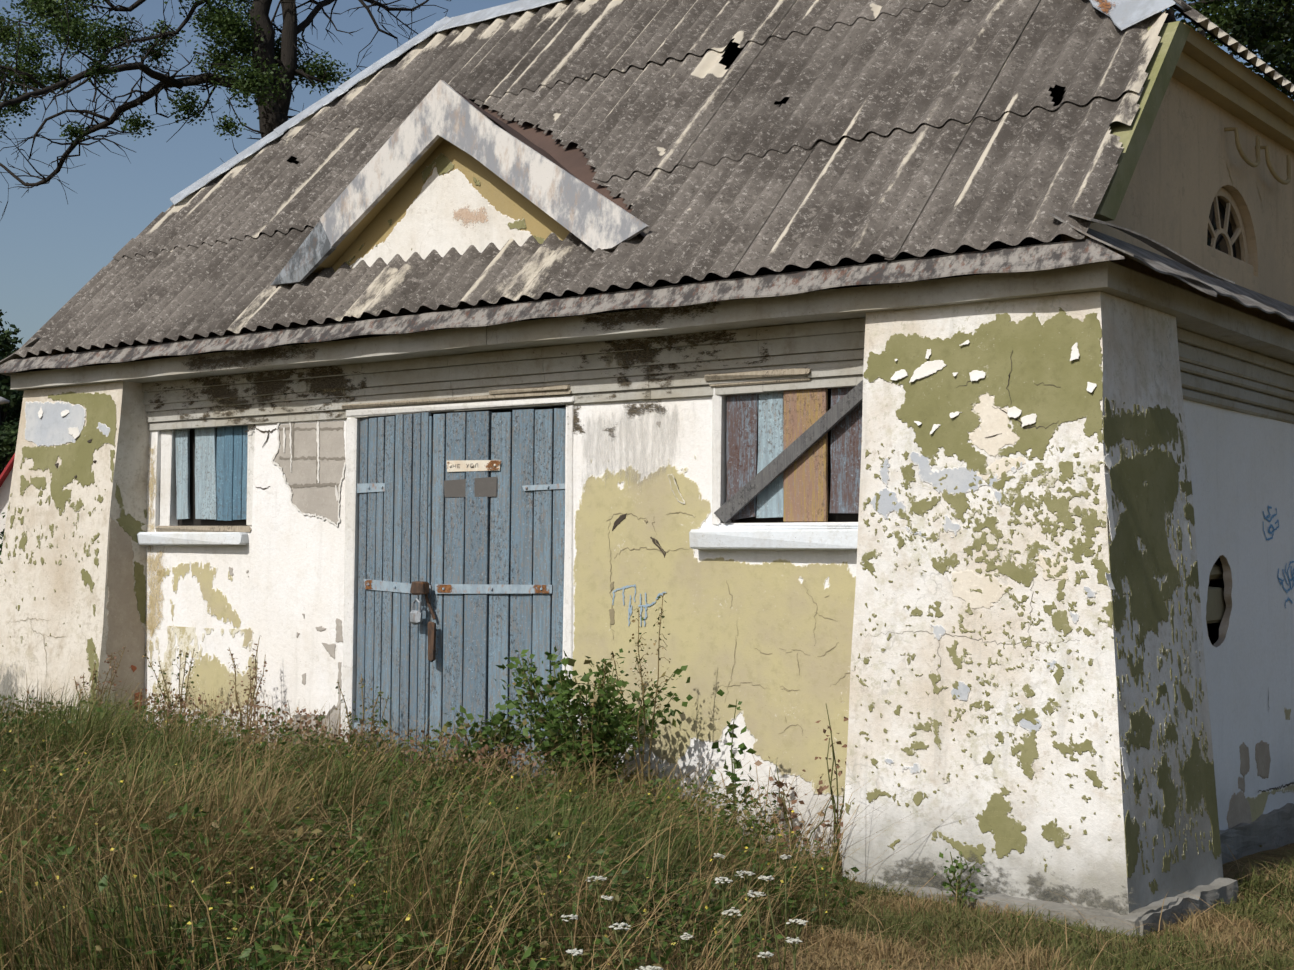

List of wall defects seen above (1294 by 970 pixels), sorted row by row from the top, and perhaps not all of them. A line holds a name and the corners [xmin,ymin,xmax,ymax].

rust [1095,0,1116,13]
peeling [0,391,258,722]
flaking render [296,613,343,659]
crack [607,512,696,632]
peeling [572,307,1294,894]